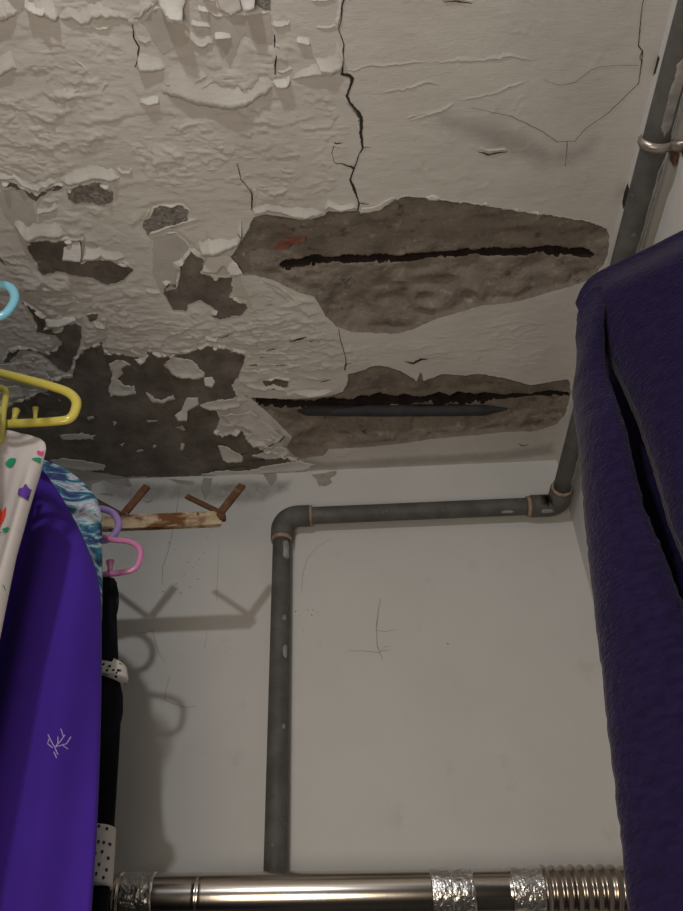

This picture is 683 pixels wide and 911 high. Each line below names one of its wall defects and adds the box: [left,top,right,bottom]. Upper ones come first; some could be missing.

peeling [0,0,343,110]
crack [332,0,371,211]
peeling [0,165,135,286]
spalling [131,194,609,334]
peeling [0,301,571,499]